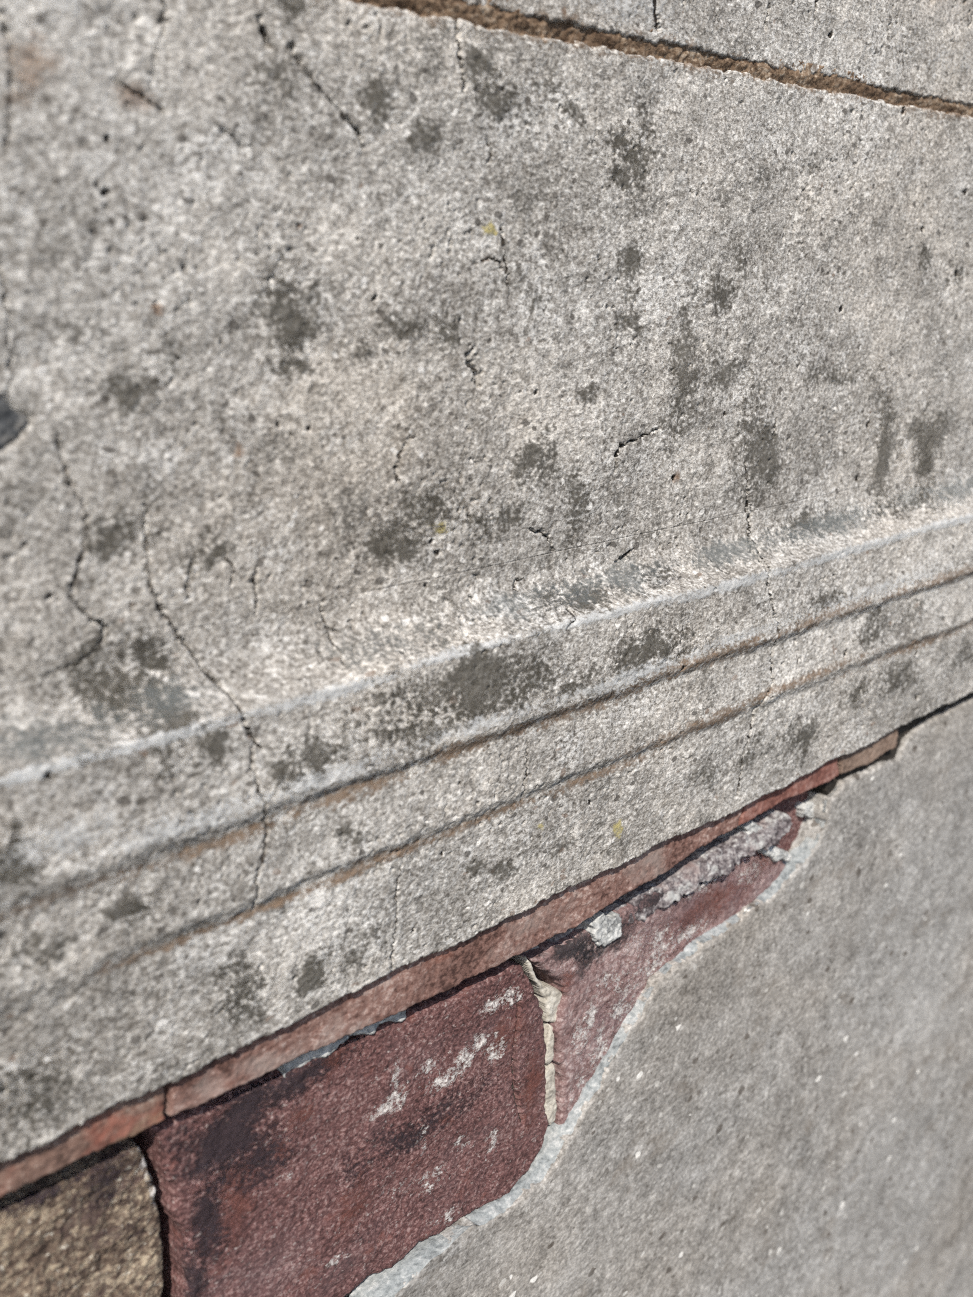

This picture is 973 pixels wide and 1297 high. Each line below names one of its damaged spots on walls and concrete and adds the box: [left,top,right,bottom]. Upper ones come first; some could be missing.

crack [0,21,13,155]
crack [0,271,12,400]
crack [50,437,103,673]
crack [143,502,267,906]
crack [736,462,780,795]
spalling [658,786,838,974]
spalling [349,987,654,1297]